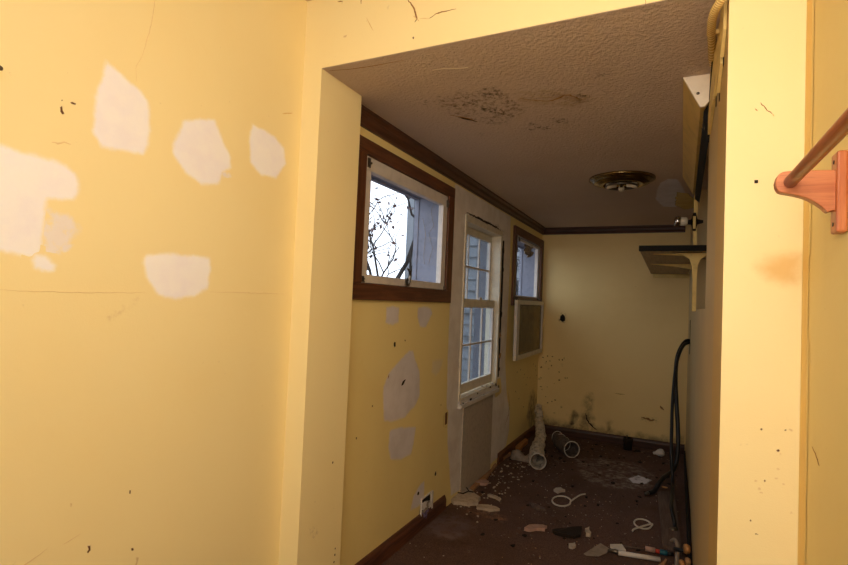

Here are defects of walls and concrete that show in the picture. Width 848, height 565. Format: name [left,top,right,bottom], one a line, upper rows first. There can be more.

crack [408,0,454,22]
water stain [402,73,560,133]